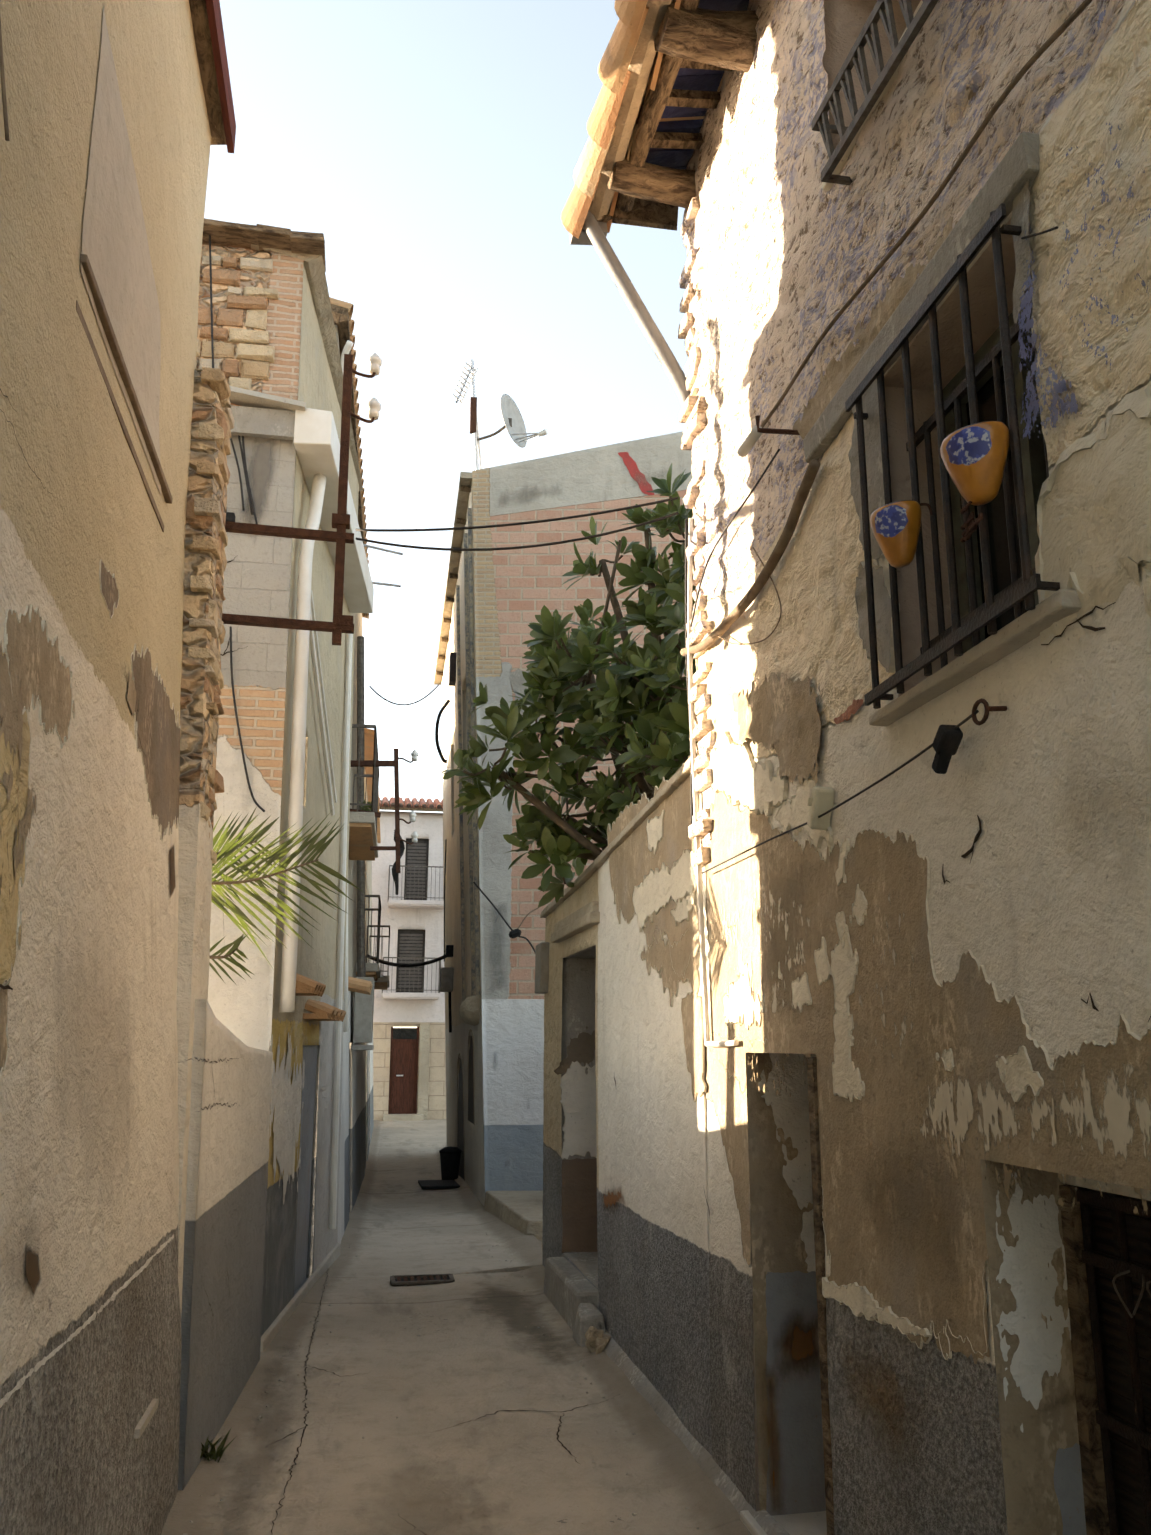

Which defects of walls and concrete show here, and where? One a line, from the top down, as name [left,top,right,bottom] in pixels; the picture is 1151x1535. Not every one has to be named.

peeling [131,644,181,841]
peeling [0,604,75,1093]
peeling [554,1026,595,1075]
peeling [607,672,1151,1410]
crack [265,1271,368,1535]
crack [438,1394,620,1463]
corrosion [767,1377,780,1509]
corrosion [783,1317,819,1369]